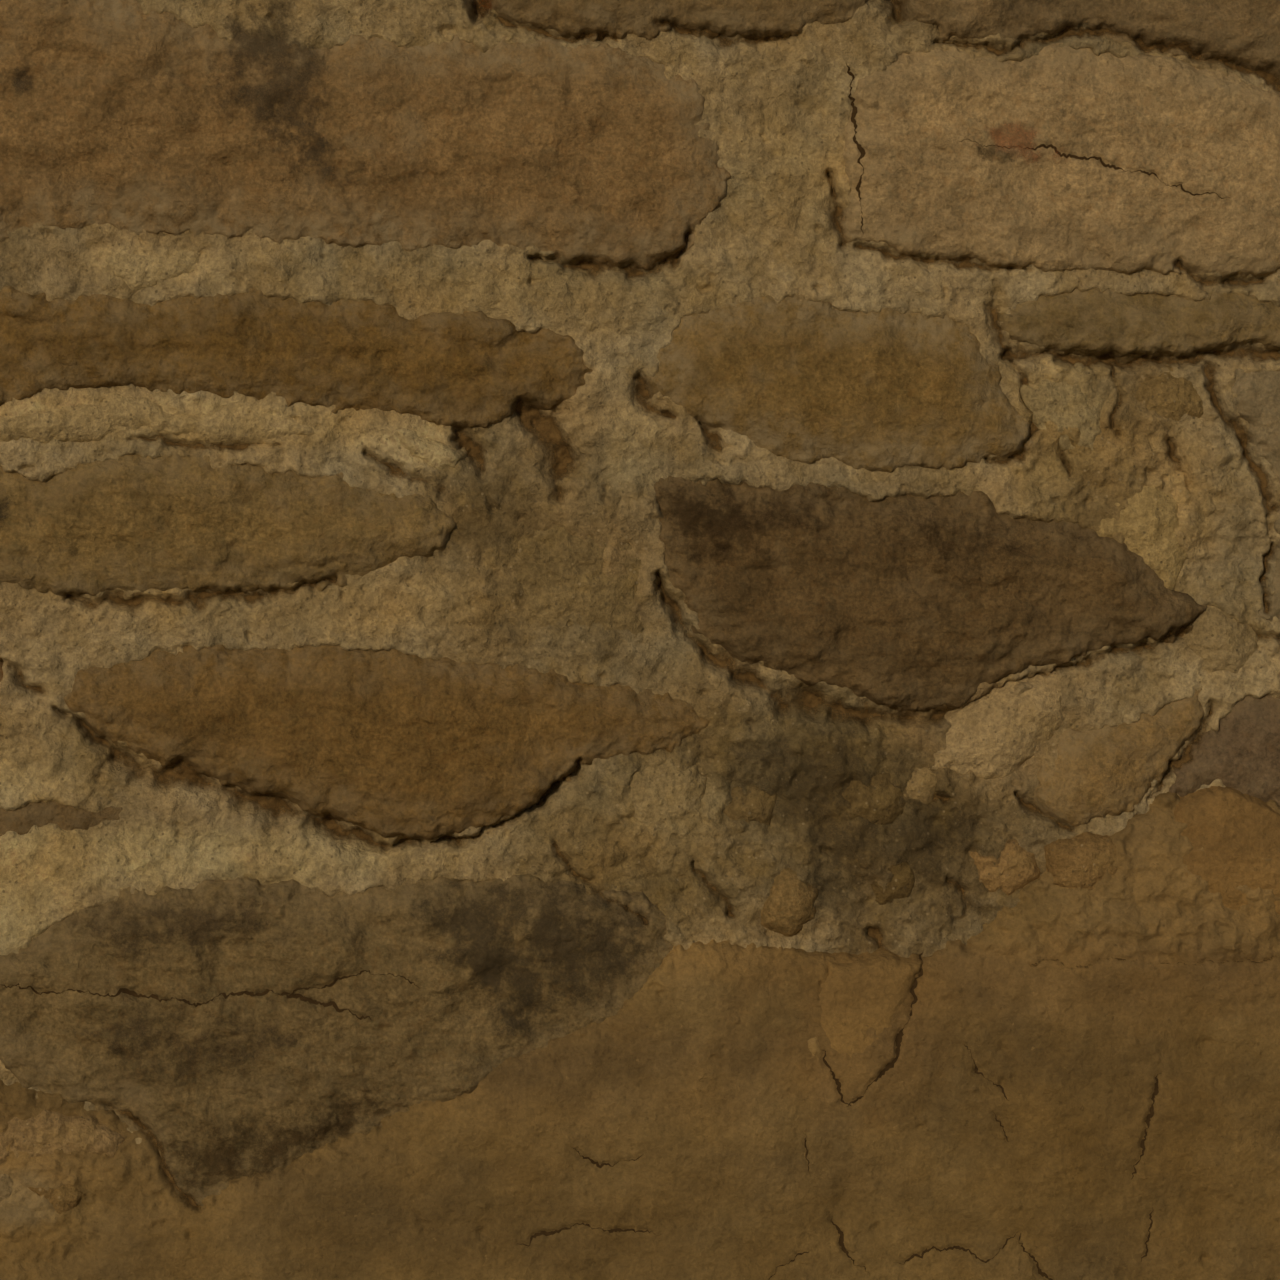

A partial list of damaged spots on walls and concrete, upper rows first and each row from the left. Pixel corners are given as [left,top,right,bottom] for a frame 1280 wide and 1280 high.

crack [846,64,866,232]
crack [959,139,1226,199]
crack [820,952,923,1107]
crack [1131,1073,1161,1180]
crack [520,1223,661,1247]
crack [830,1216,1053,1280]
crack [1141,1207,1153,1260]